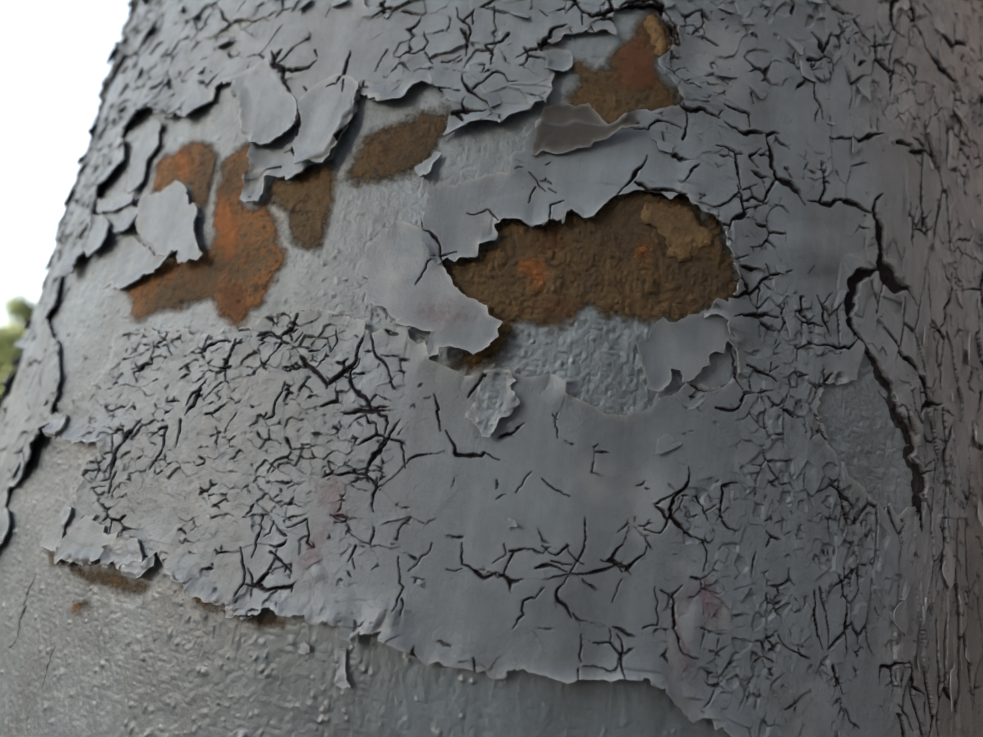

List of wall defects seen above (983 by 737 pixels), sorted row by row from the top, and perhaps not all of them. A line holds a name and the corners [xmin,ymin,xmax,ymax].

crack [271,51,318,90]
crack [376,0,716,108]
rust [565,11,681,124]
rust [124,104,451,329]
rust [446,190,738,371]
peeling [0,5,737,737]
crack [349,362,406,468]
crack [434,394,499,460]
peeling [794,345,925,527]
crack [513,467,738,677]
peeling [942,549,963,606]
peeling [950,662,958,712]